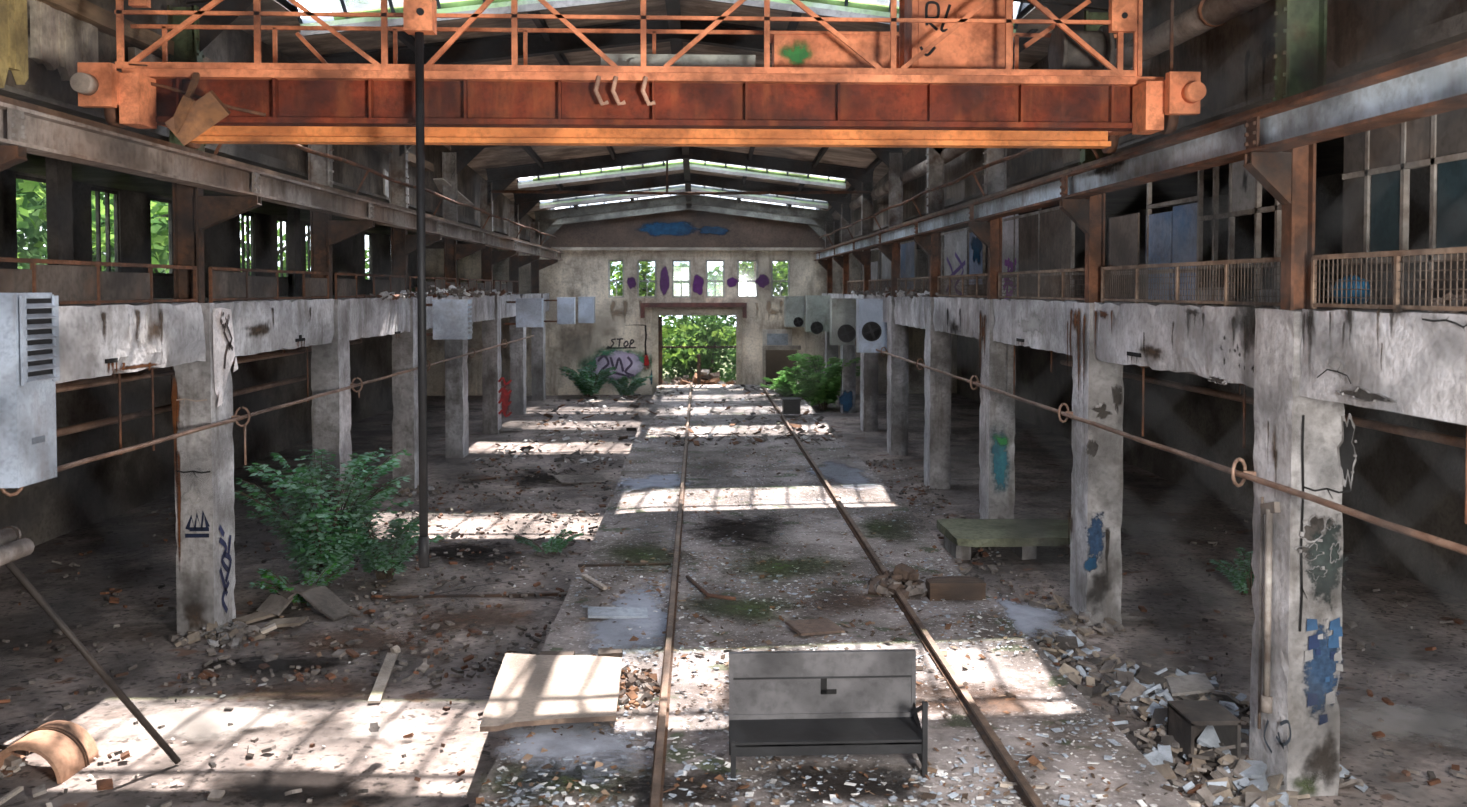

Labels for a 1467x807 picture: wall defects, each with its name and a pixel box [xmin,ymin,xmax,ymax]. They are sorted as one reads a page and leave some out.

damp [1127,309,1205,362]
damp [1220,294,1266,372]